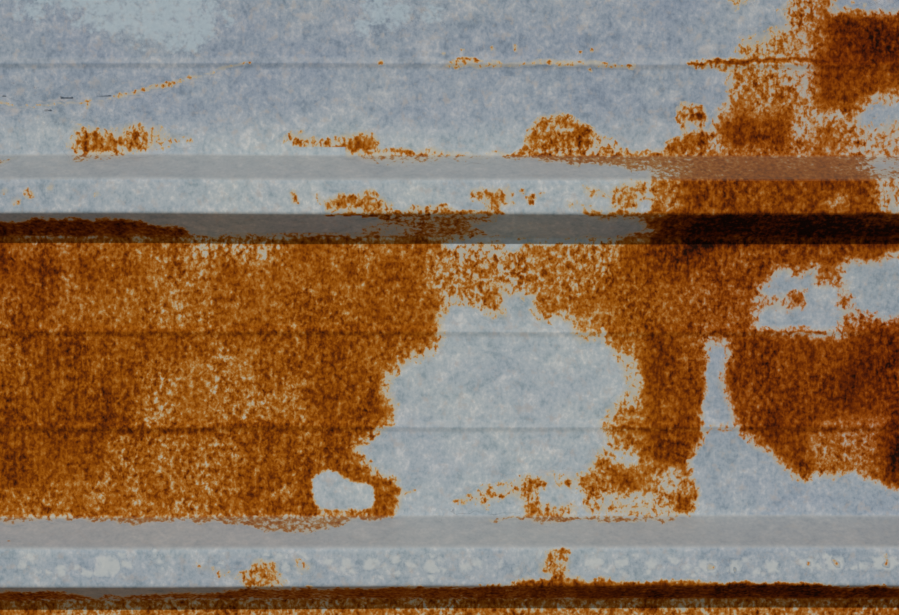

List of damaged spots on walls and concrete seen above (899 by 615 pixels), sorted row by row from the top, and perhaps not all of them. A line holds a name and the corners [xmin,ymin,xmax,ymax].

rust [60,117,199,162]
rust [279,0,899,242]
rust [0,182,899,535]
rust [0,545,899,615]